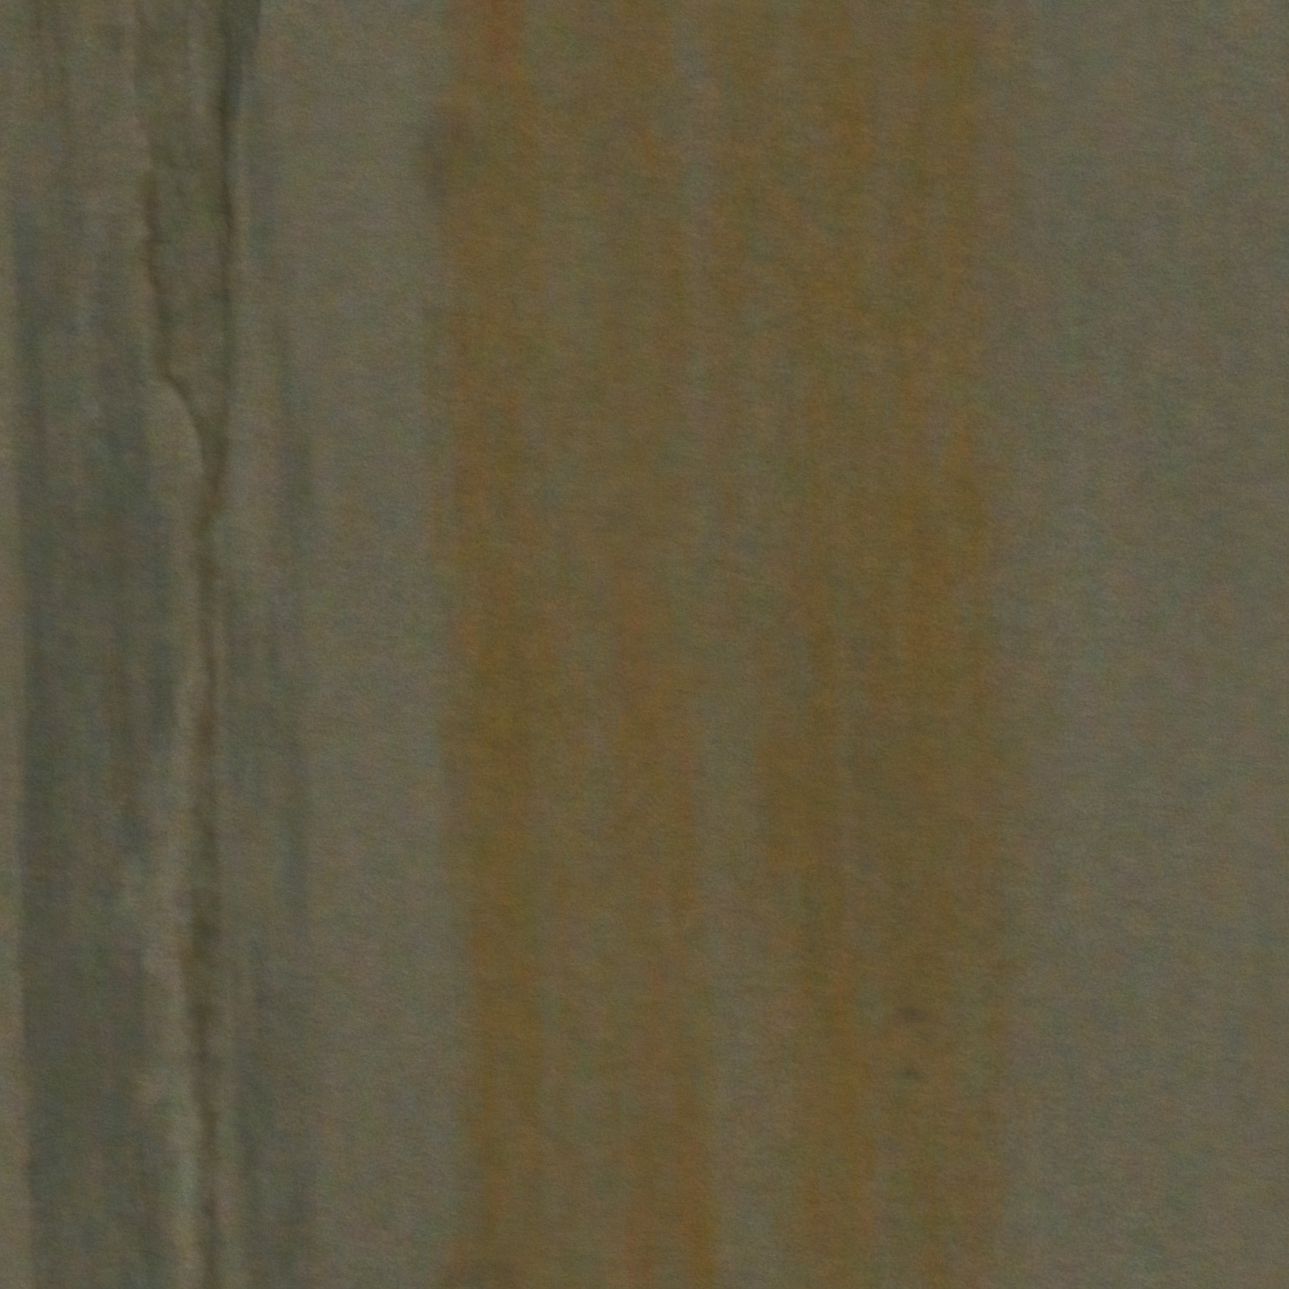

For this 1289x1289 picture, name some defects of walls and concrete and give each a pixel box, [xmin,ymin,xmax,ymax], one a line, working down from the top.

leakage [0,0,342,1289]
rust [391,0,1111,1289]